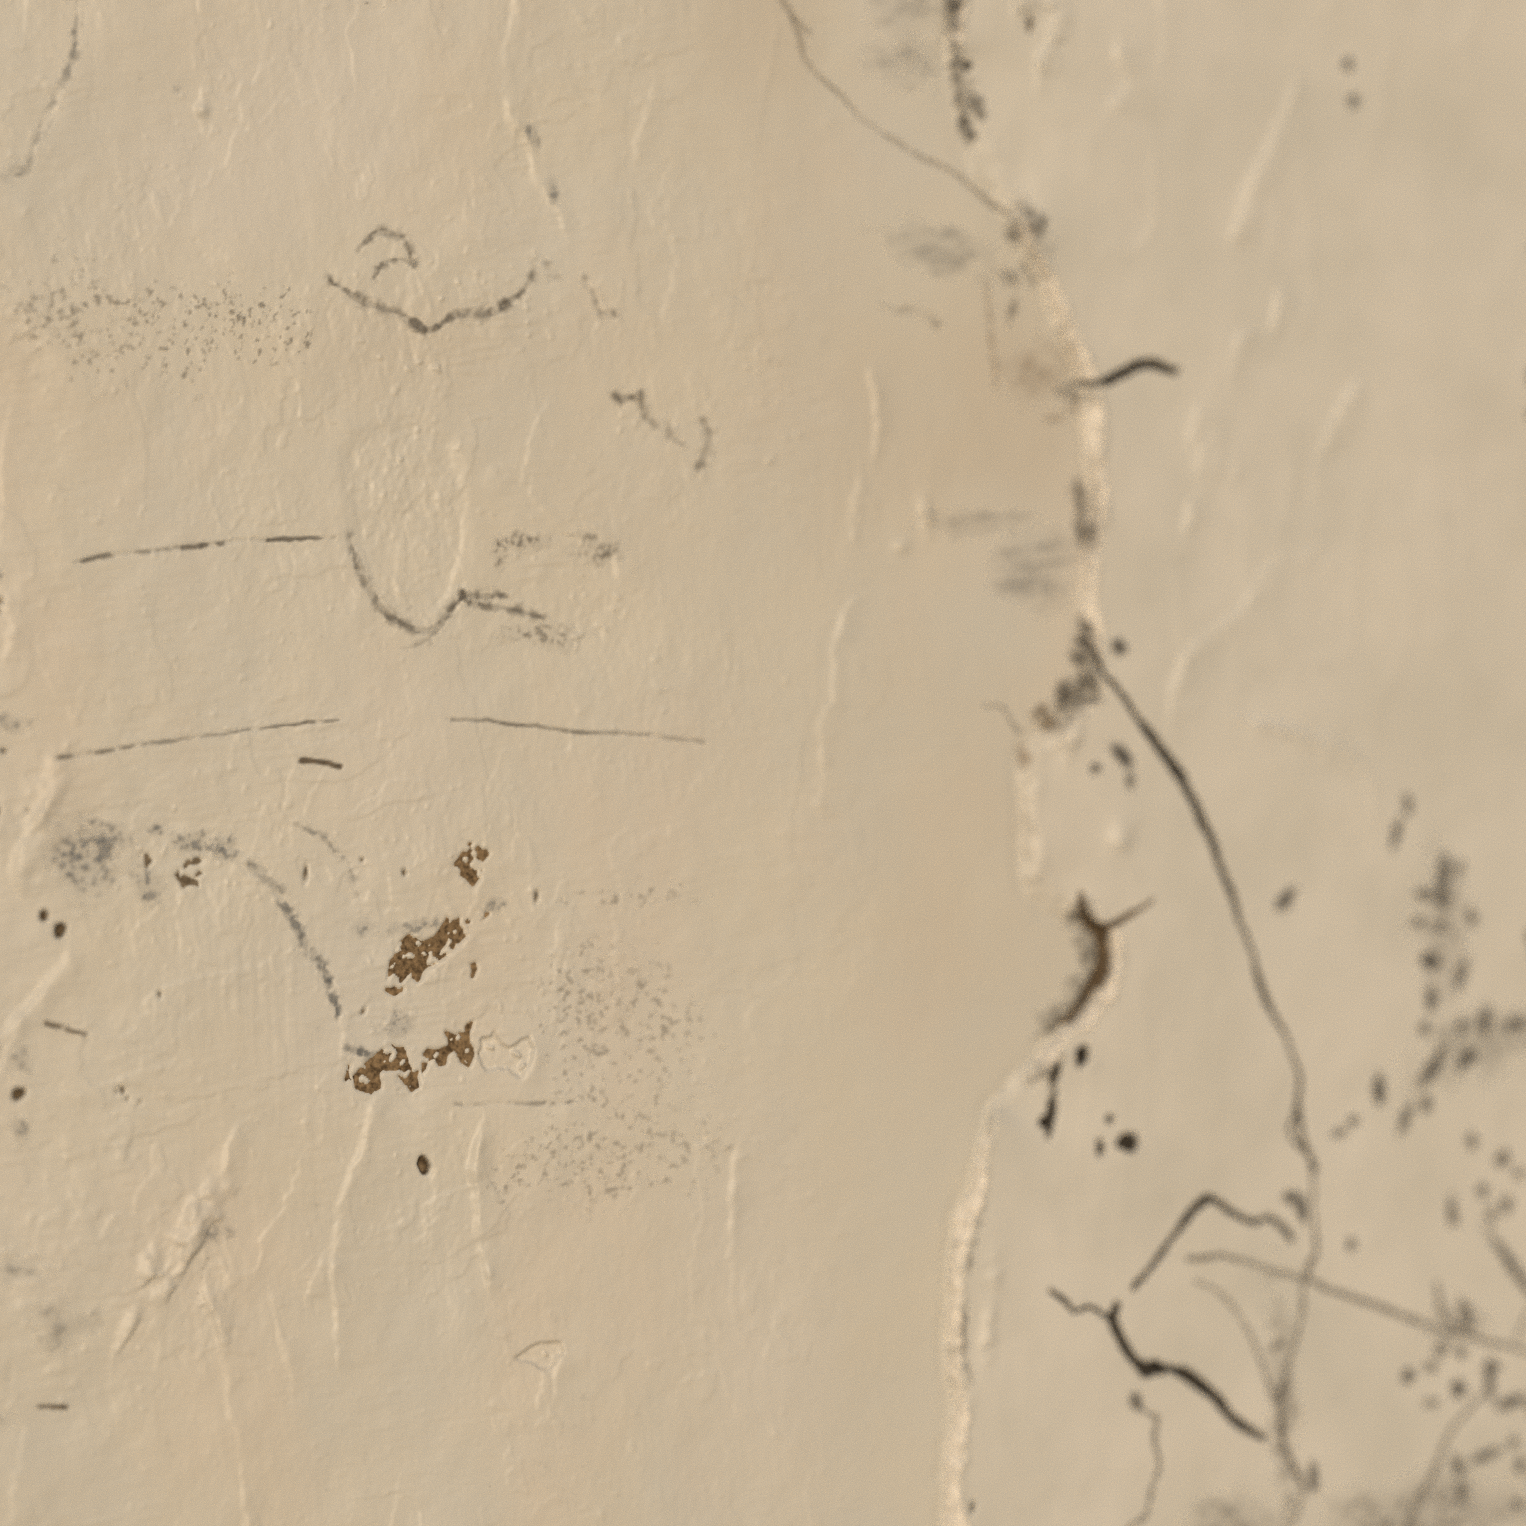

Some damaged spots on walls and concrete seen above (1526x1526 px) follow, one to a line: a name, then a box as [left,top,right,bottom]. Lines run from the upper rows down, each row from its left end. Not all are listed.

peeling [949,0,970,70]
crack [1074,359,1180,386]
peeling [1081,402,1126,657]
spalling [1113,747,1133,786]
spalling [385,842,509,1010]
peeling [1037,928,1123,1137]
spalling [1096,1116,1137,1155]
crack [1049,637,1526,1526]
peeling [942,1130,992,1526]